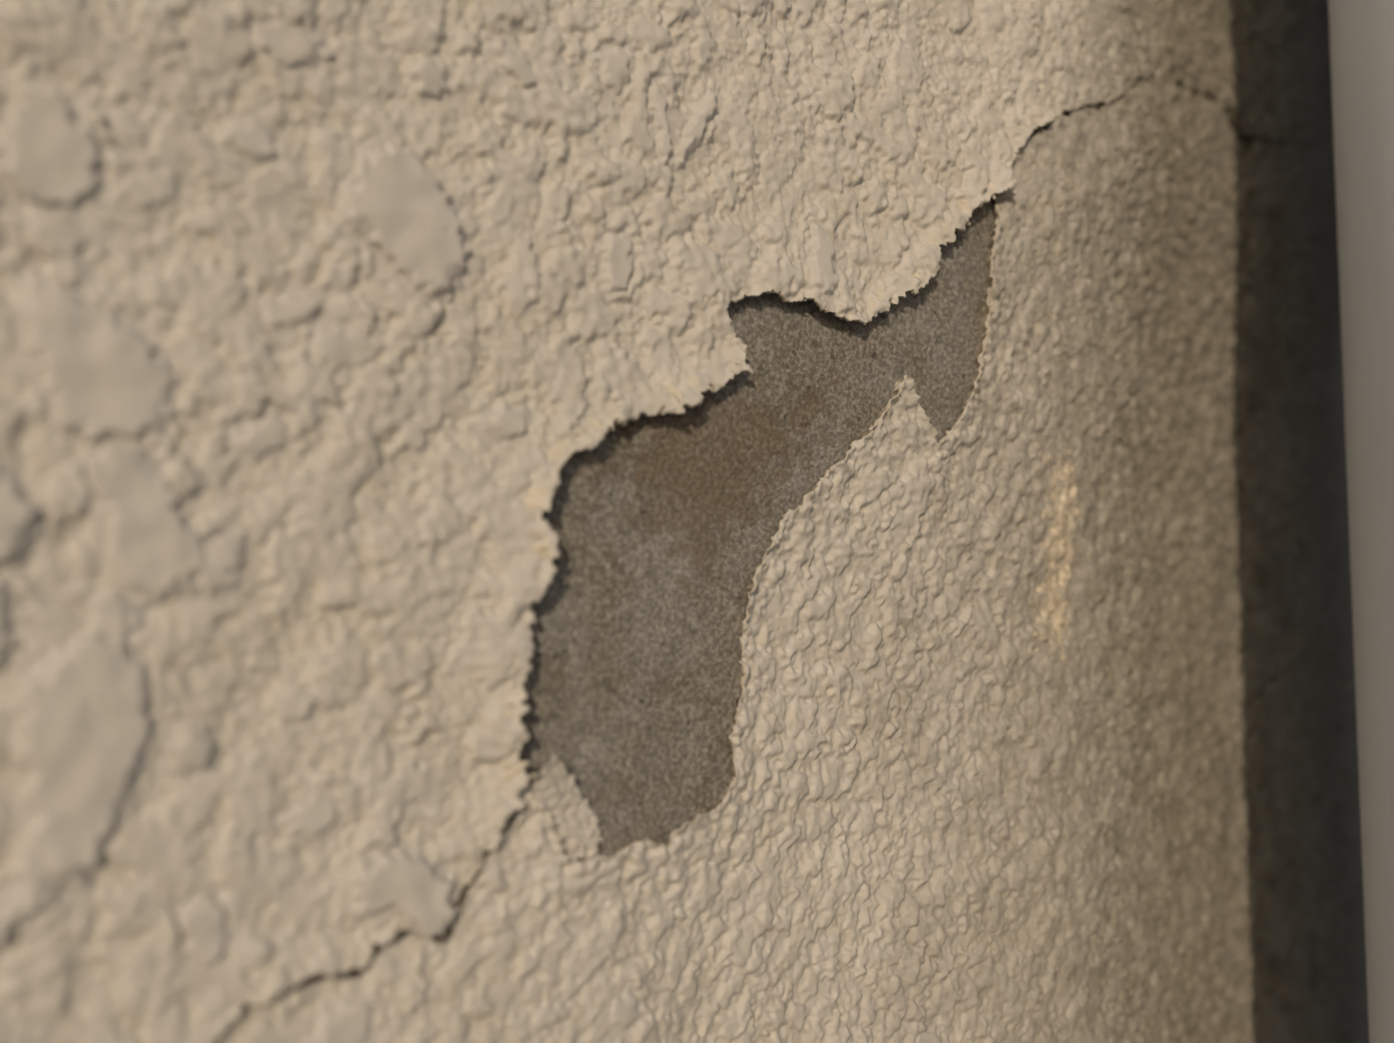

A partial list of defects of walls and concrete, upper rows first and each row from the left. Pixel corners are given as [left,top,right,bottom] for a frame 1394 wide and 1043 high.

crack [1013,73,1307,162]
peeling [492,169,1018,887]